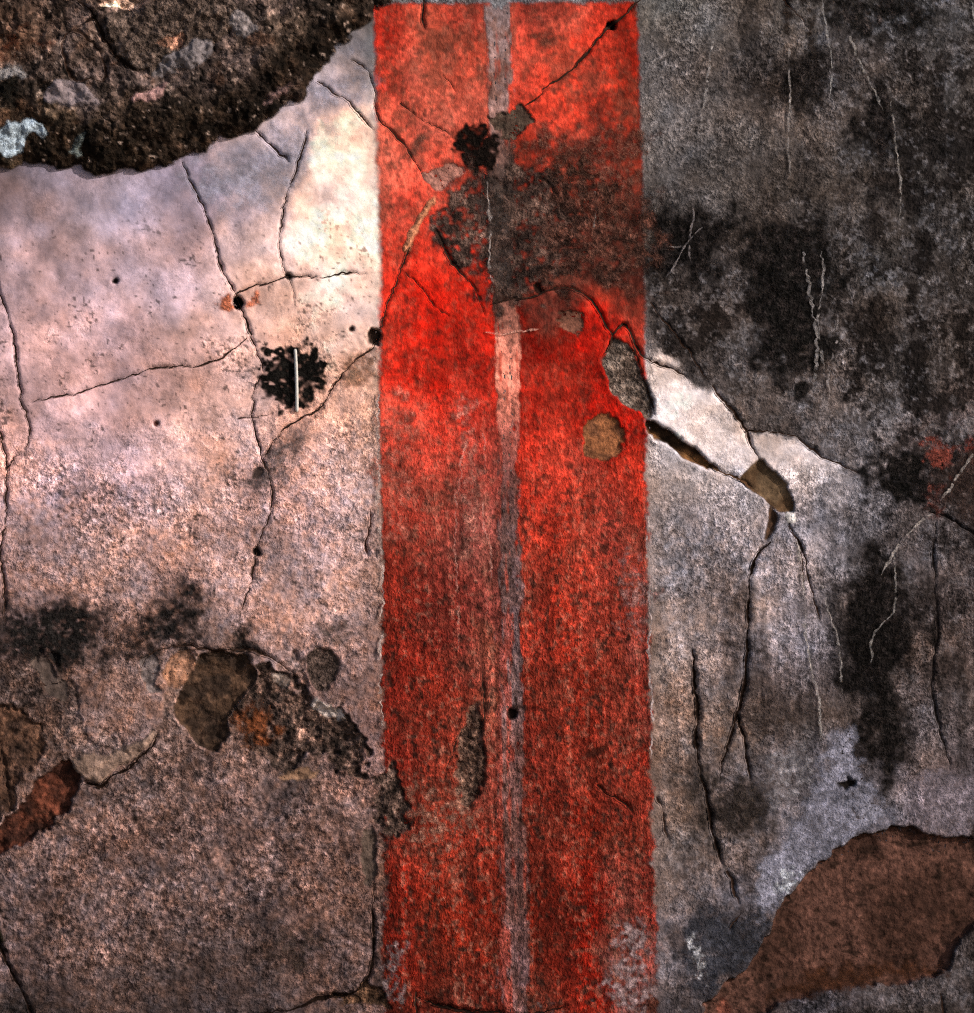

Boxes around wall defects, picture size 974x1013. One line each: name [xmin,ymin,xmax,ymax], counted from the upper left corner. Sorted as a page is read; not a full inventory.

peeling [79,0,258,102]
crack [317,60,424,178]
crack [0,130,445,621]
mould [258,337,336,416]
water stain [429,119,849,401]
crack [435,228,857,472]
spalling [740,460,796,540]
mould [0,577,204,673]
spalling [140,647,486,886]
crack [692,523,820,928]
water stain [673,541,938,1002]
spalling [703,826,974,1013]